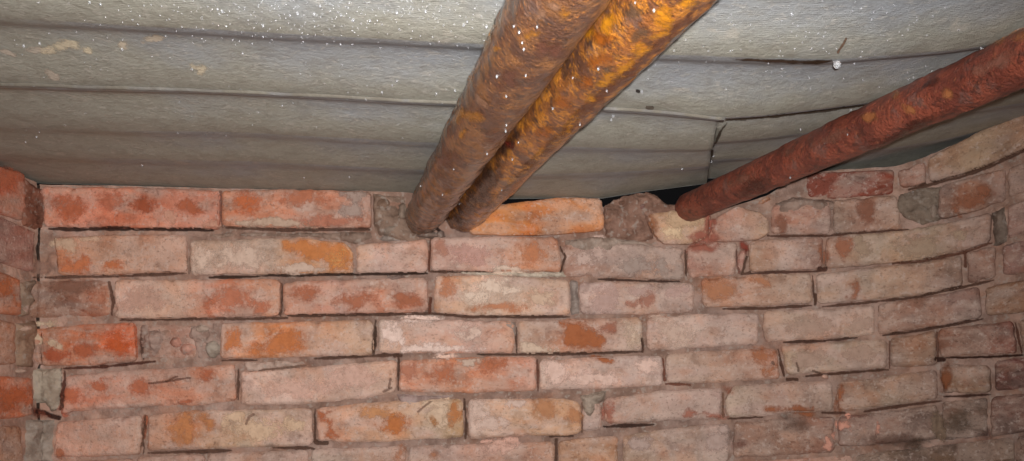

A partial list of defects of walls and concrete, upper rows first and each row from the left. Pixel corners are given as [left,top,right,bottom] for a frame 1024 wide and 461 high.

rust [575,8,672,104]
crack [711,105,864,157]
rust [689,215,718,252]